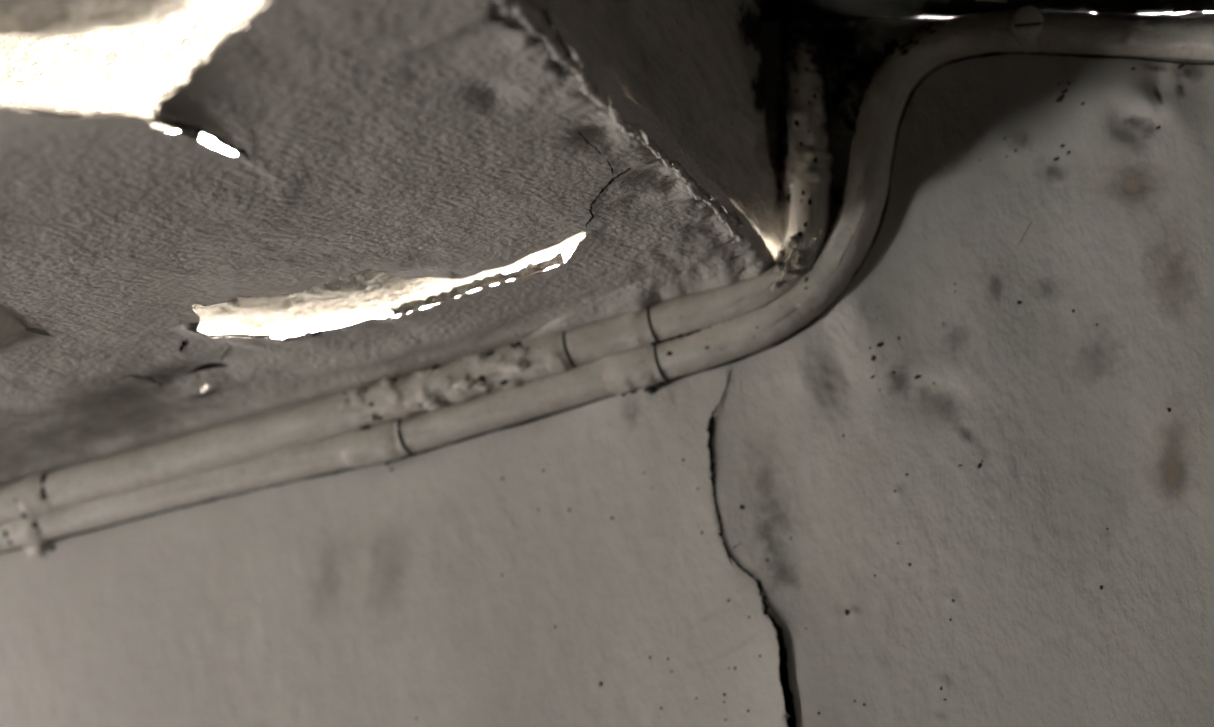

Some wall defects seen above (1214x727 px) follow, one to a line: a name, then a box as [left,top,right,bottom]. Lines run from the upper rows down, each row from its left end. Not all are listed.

peeling [0,0,270,160]
damp [738,2,937,210]
peeling [0,305,52,355]
peeling [338,376,397,430]
flaking render [192,231,586,339]
peeling [413,0,819,412]
crack [585,153,649,229]
crack [706,368,799,727]